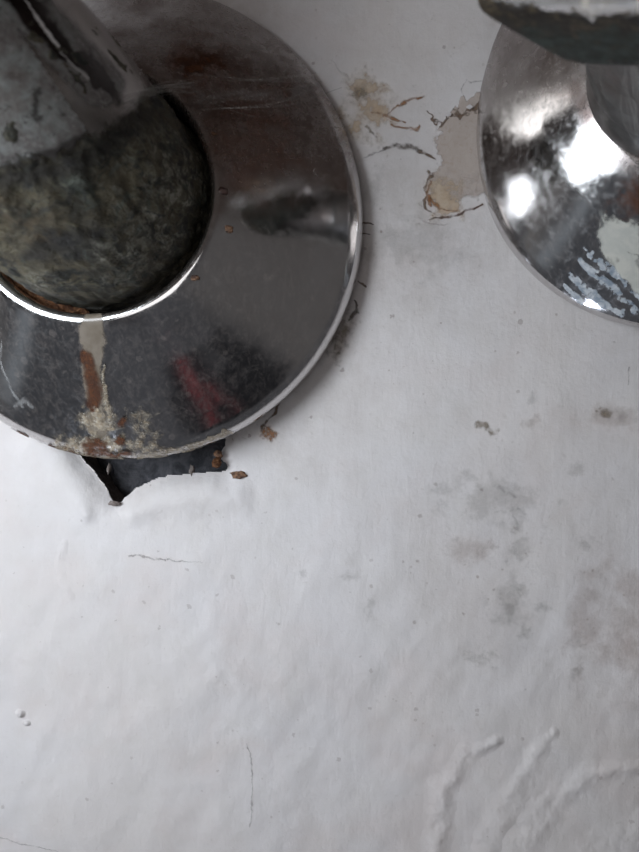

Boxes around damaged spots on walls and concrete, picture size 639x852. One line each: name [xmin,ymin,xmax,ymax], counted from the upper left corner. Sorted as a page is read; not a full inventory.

crack [383,144,435,159]
peeling [423,92,484,212]
spalling [80,438,248,506]